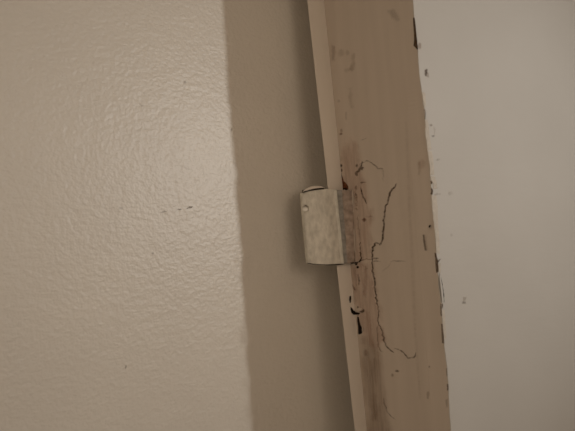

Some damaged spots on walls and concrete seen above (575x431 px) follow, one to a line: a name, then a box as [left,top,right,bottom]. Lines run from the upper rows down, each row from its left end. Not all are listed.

spalling [349,296,364,334]
crack [351,183,415,357]